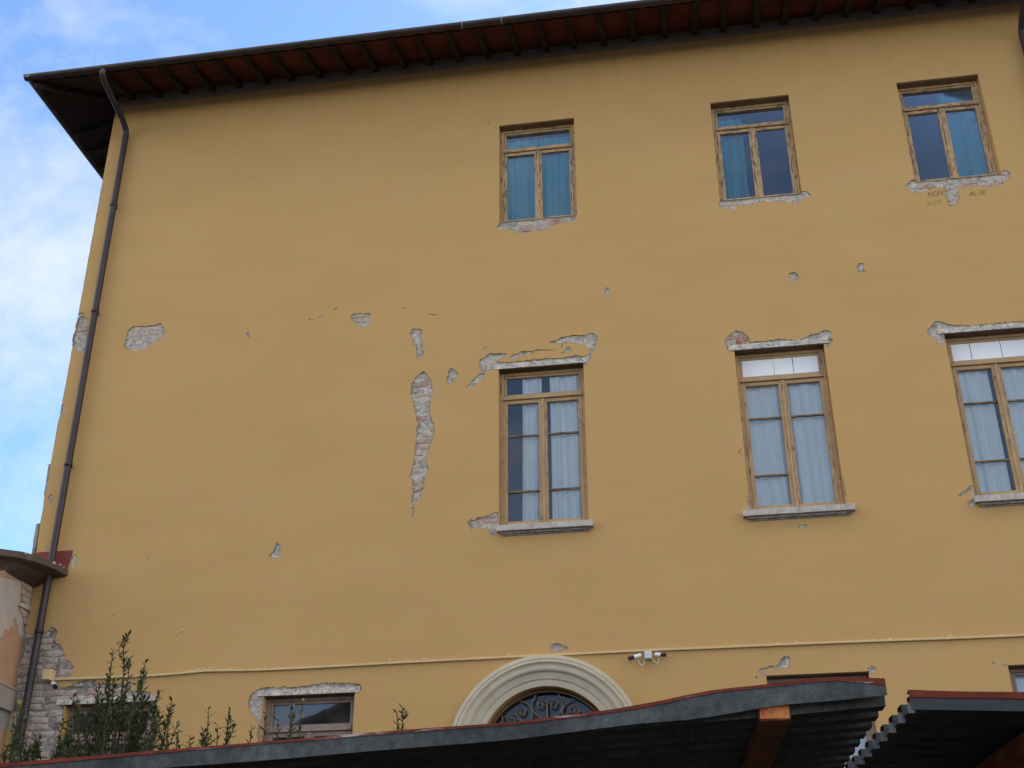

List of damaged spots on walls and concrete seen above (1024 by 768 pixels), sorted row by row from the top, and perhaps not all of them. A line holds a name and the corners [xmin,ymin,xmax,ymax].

flaking render [718,191,811,210]
flaking render [905,170,1010,206]
flaking render [496,216,576,234]
flaking render [72,312,88,352]
flaking render [124,323,165,351]
flaking render [410,328,424,359]
flaking render [467,333,598,388]
flaking render [725,330,833,352]
flaking render [410,371,435,517]
flaking render [468,512,498,535]
flaking render [0,577,156,760]
flaking render [248,682,362,742]